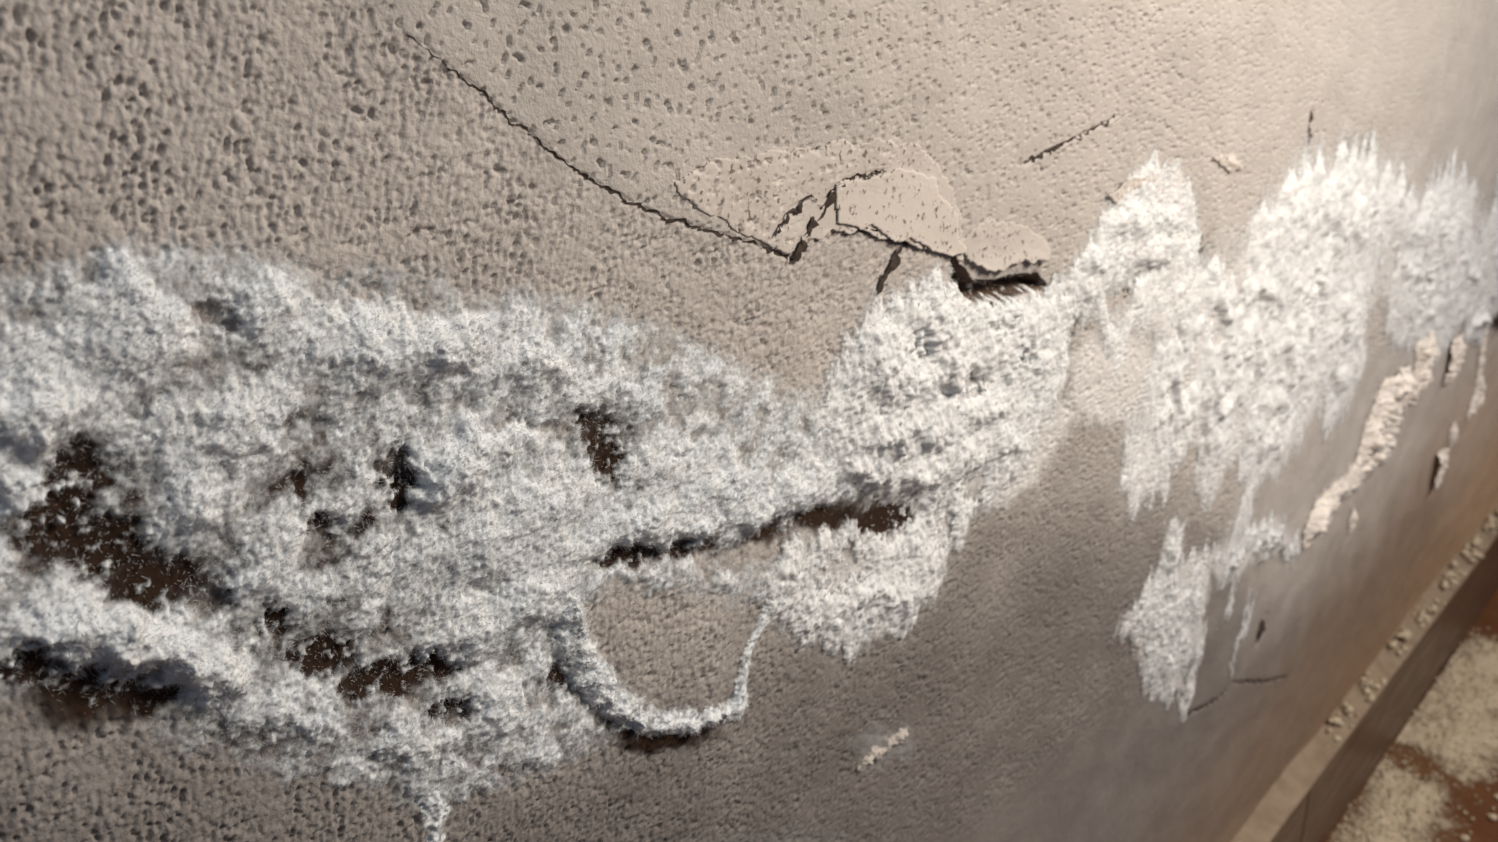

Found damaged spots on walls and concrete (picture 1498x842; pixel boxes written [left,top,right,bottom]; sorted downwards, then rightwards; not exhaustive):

crack [403,32,925,296]
peeling [674,138,1051,304]
leakage [1435,421,1459,490]
leakage [1348,508,1358,533]
leakage [1229,585,1257,678]